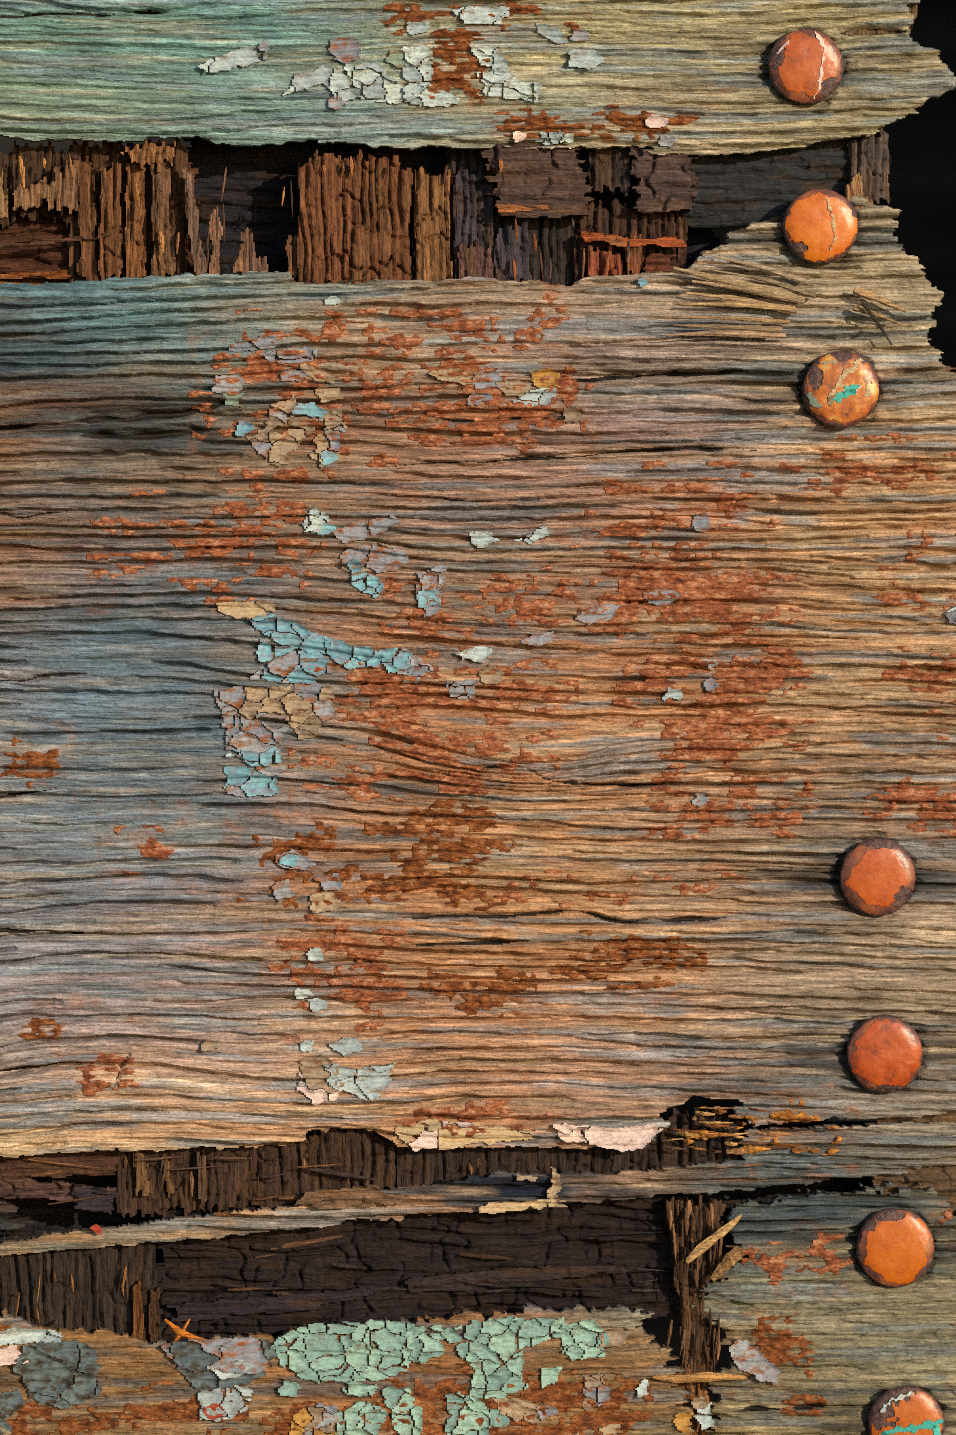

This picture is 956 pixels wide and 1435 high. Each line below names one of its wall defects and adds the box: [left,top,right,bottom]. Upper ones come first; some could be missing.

corrosion [380,0,700,141]
peeling [214,600,434,797]
peeling [446,646,504,699]
peeling [521,631,556,646]
peeling [0,1327,102,1435]
peeling [161,1316,630,1435]
peeling [635,1379,649,1397]